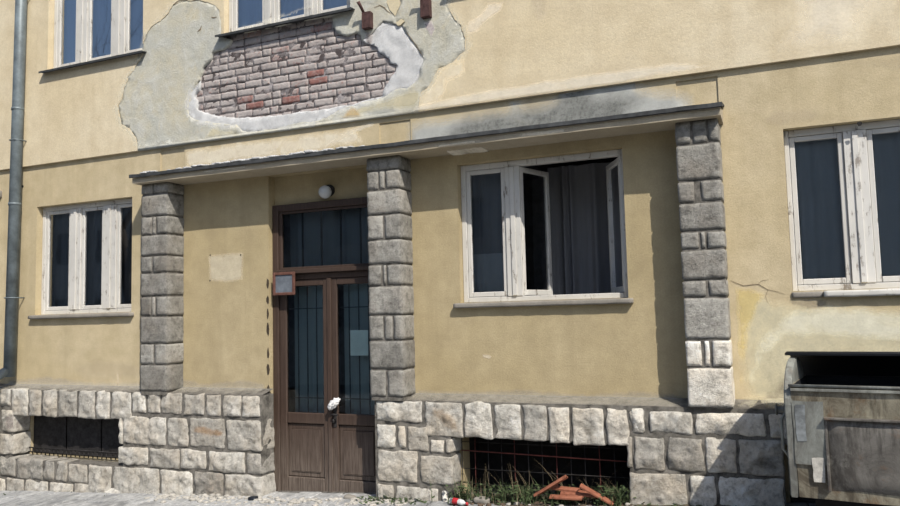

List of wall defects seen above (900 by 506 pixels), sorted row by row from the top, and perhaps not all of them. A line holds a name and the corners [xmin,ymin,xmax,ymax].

flaking render [115,0,501,172]
damp [397,66,688,144]